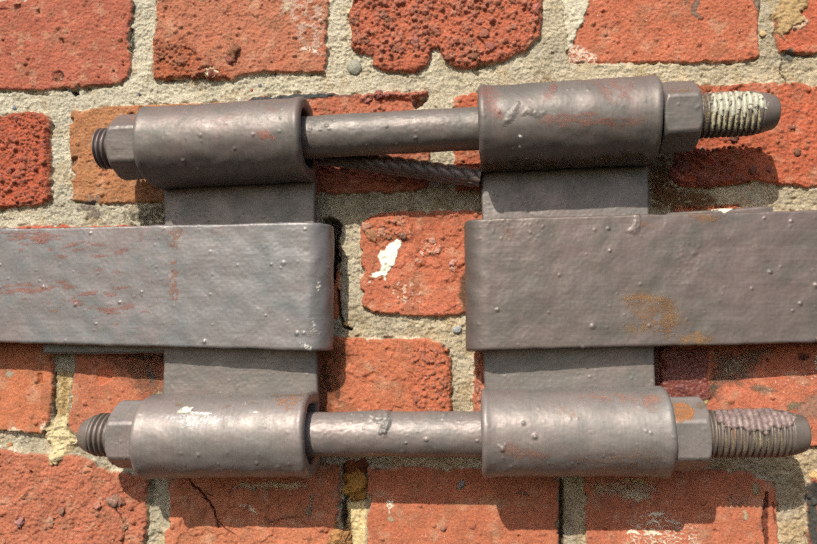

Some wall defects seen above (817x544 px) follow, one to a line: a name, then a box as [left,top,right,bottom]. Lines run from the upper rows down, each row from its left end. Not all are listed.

spalling [362,213,442,266]
crack [190,479,234,543]
damp [626,512,698,544]
crack [762,491,776,544]